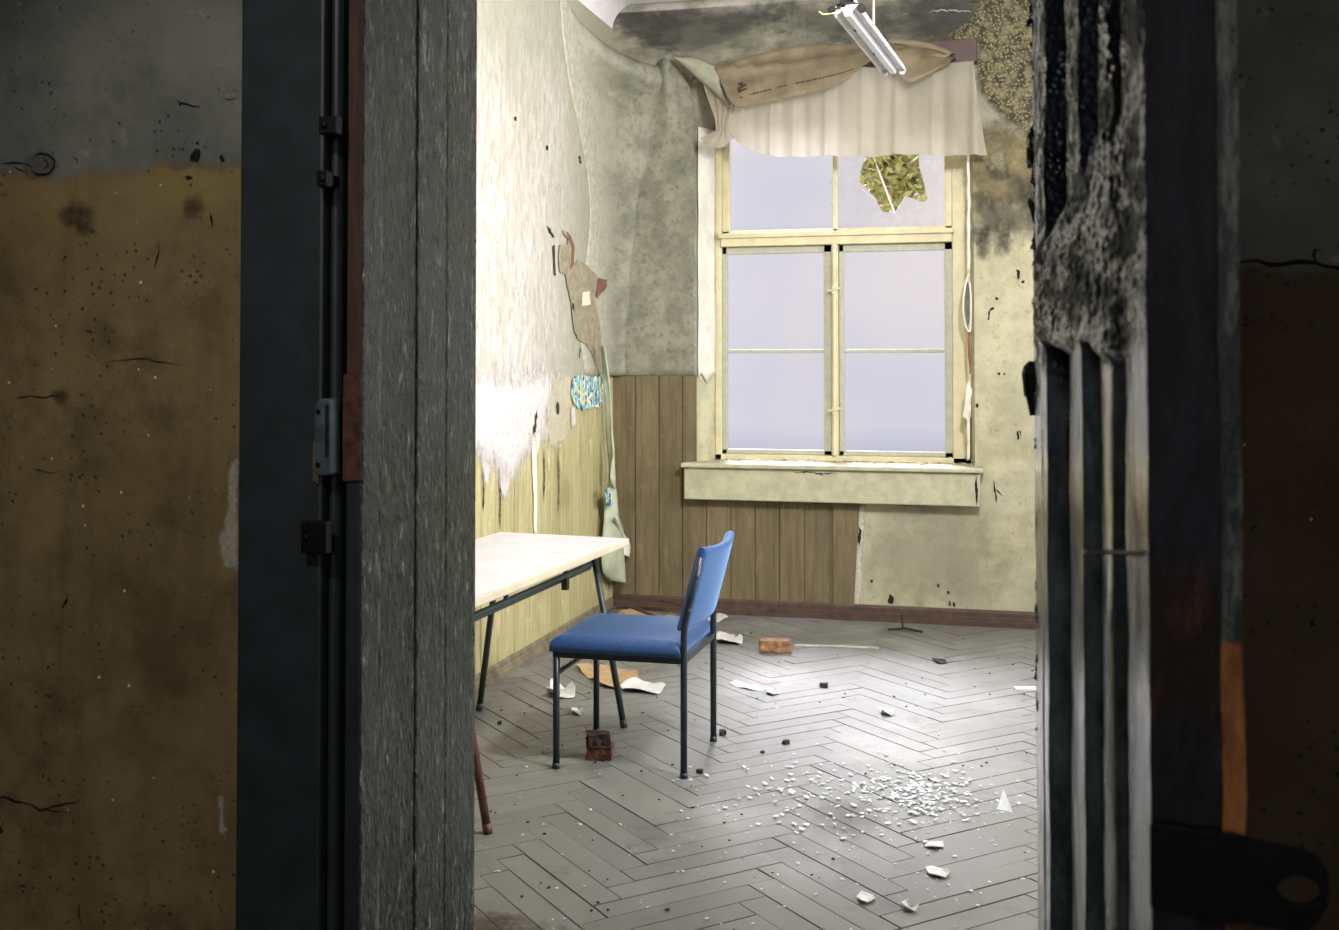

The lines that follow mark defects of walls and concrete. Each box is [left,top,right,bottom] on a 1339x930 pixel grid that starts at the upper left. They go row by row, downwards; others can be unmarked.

crack [1240,248,1339,270]
peeling [476,371,576,533]
peeling [220,460,239,570]
flaking render [854,505,873,604]
crack [0,796,79,813]